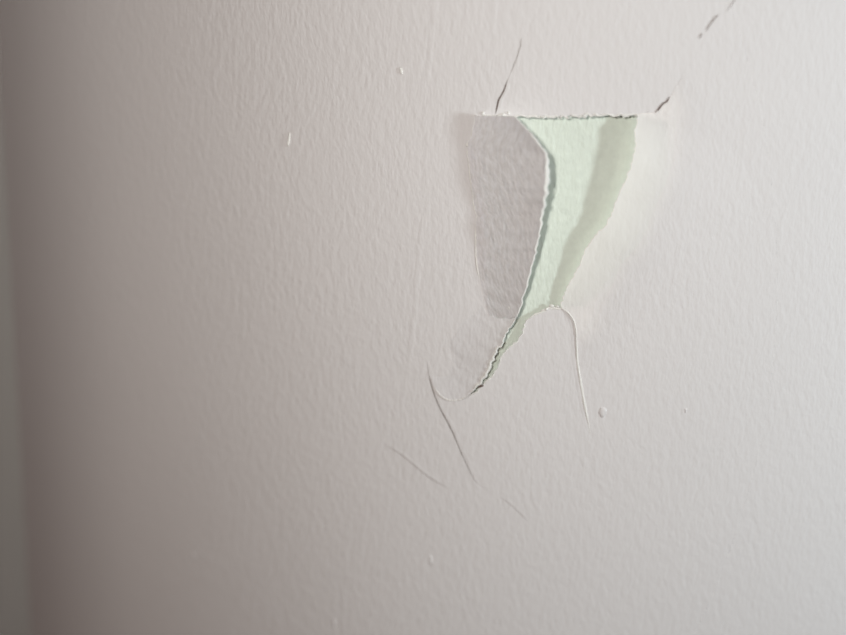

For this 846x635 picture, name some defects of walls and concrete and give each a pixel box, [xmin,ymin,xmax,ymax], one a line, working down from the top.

flaking render [469,115,637,396]